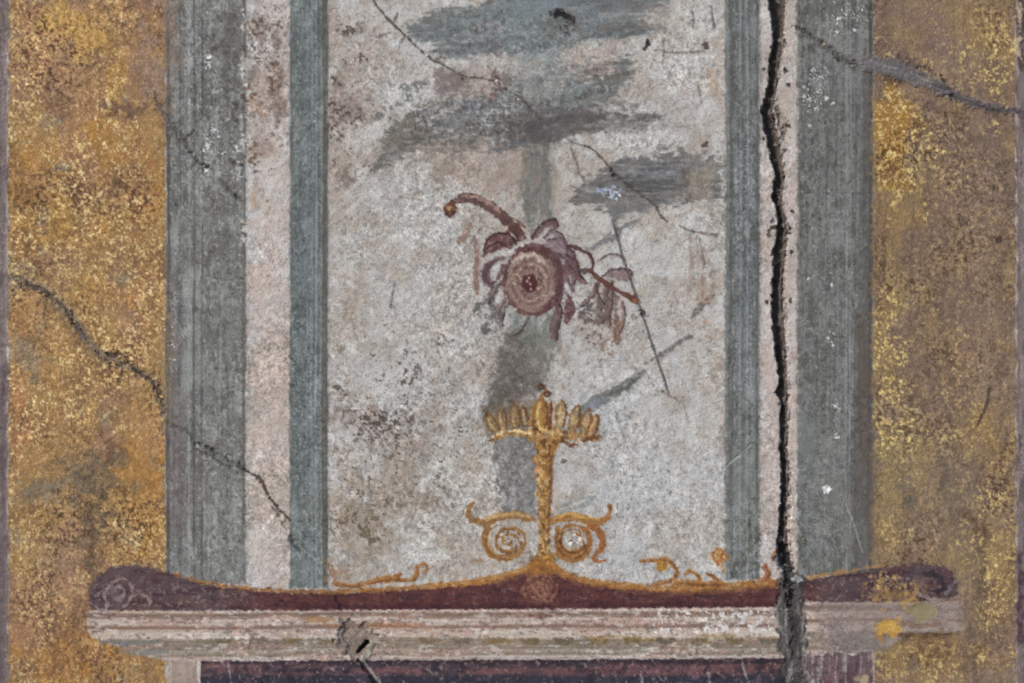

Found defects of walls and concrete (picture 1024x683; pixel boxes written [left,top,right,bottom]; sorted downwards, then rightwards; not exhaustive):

crack [372,0,543,123]
crack [570,141,719,269]
crack [760,0,1024,678]
crack [3,272,332,570]
spalling [332,595,382,683]